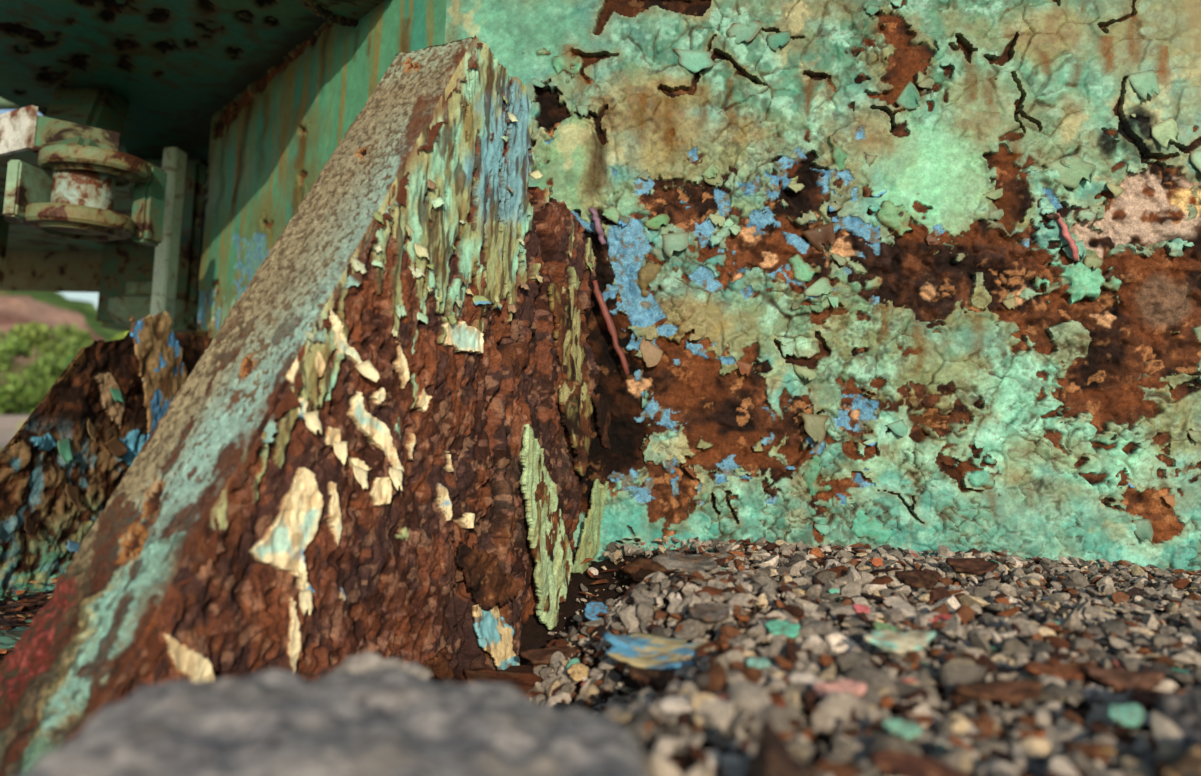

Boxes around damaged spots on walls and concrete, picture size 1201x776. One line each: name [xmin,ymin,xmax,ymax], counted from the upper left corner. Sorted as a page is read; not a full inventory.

crack [1097,0,1138,34]
crack [570,0,768,145]
crack [955,31,1043,133]
crack [1113,75,1201,162]
peeling [209,21,592,529]
corrosion [239,358,252,379]
peeling [568,117,1201,544]
corrosion [520,281,611,630]
corrosion [119,483,163,561]
peeling [251,467,342,673]
peeling [472,604,520,670]
corrosion [421,646,584,698]